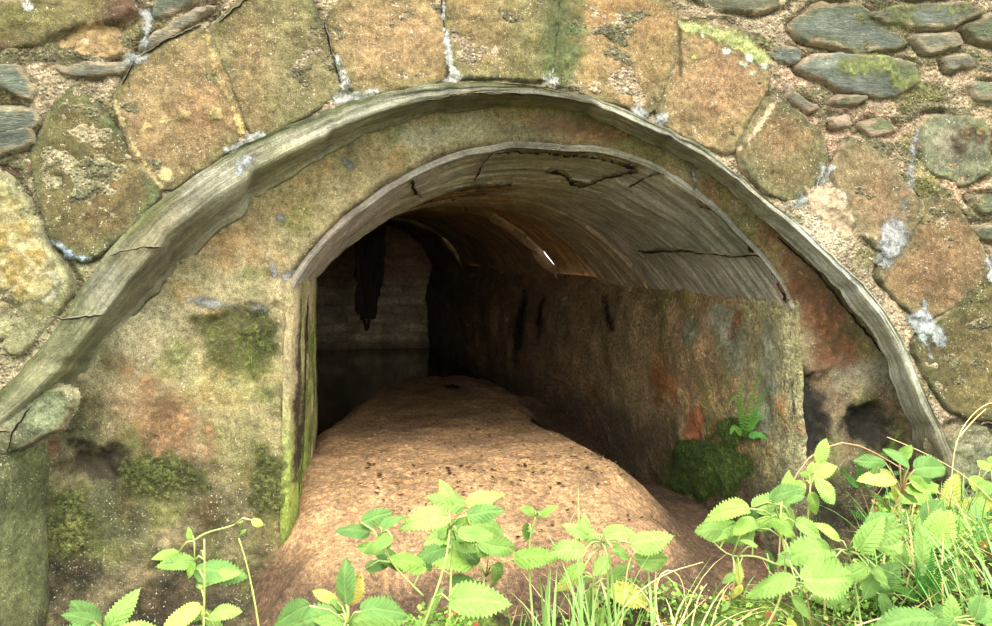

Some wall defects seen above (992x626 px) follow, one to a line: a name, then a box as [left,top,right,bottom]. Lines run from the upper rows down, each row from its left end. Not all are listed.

crack [113,0,246,189]
crack [411,149,664,203]
damp [907,128,920,187]
crack [110,245,162,256]
crack [638,201,788,303]
damp [875,199,910,269]
crack [777,237,881,352]
damp [907,300,947,358]
crack [0,407,31,457]